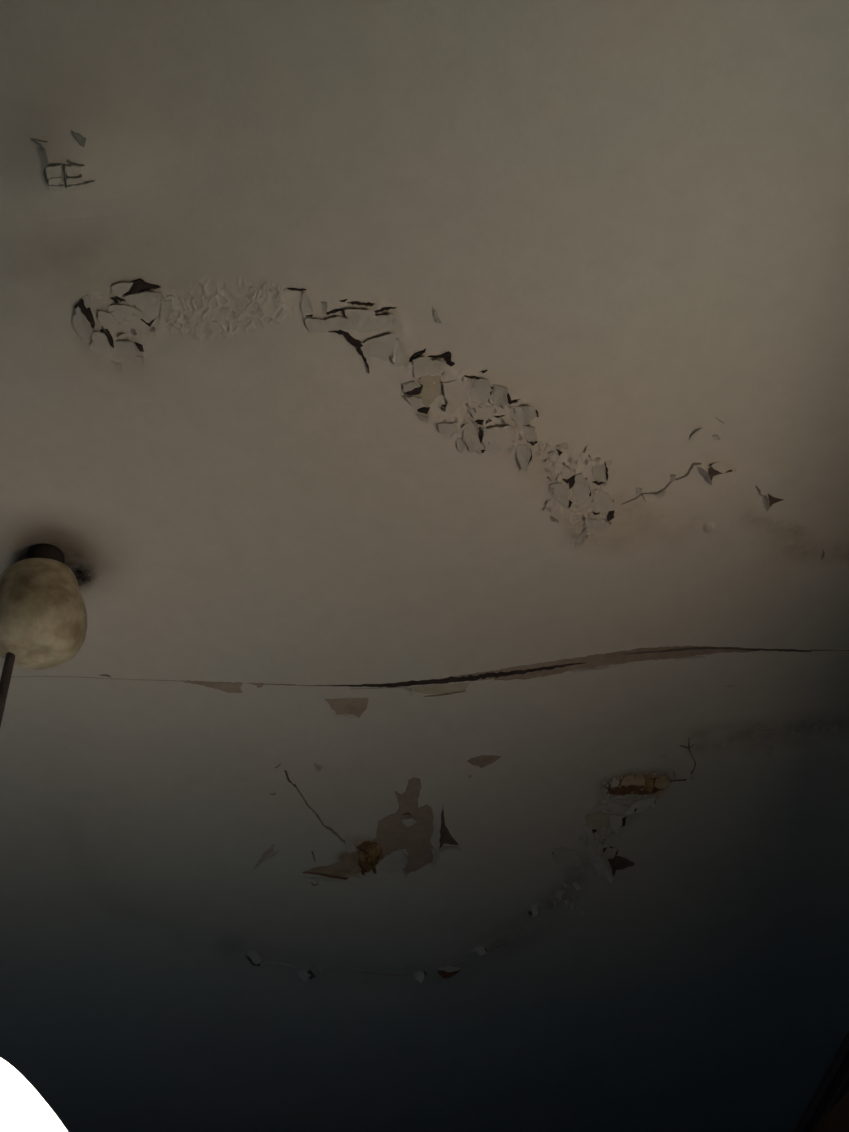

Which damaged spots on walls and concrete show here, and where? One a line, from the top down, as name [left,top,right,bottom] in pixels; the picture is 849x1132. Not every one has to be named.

peeling [39,148,84,186]
peeling [70,275,173,371]
peeling [287,288,620,549]
crack [621,462,701,505]
peeling [755,486,784,511]
crack [0,646,849,697]
peeling [324,697,369,718]
crack [270,764,346,844]
peeling [303,777,462,886]